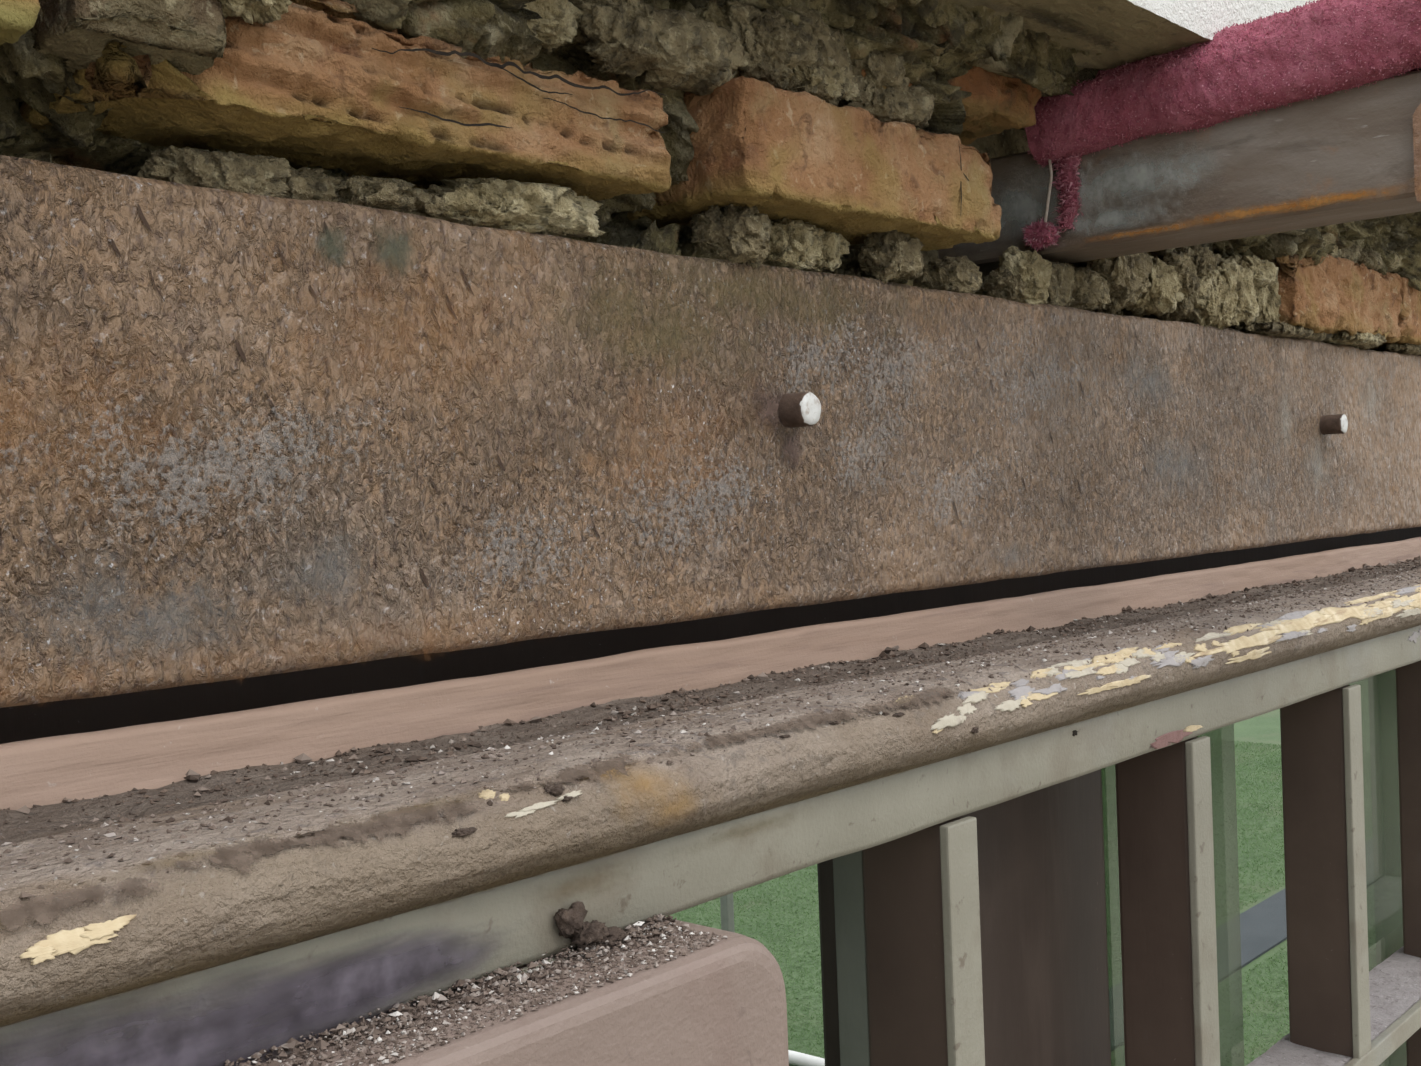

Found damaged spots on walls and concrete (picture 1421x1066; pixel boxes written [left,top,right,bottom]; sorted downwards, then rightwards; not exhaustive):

crack [372,48,666,133]
rust [1202,190,1388,222]
peeling [663,584,1421,753]
peeling [169,754,637,873]
peeling [0,878,160,965]